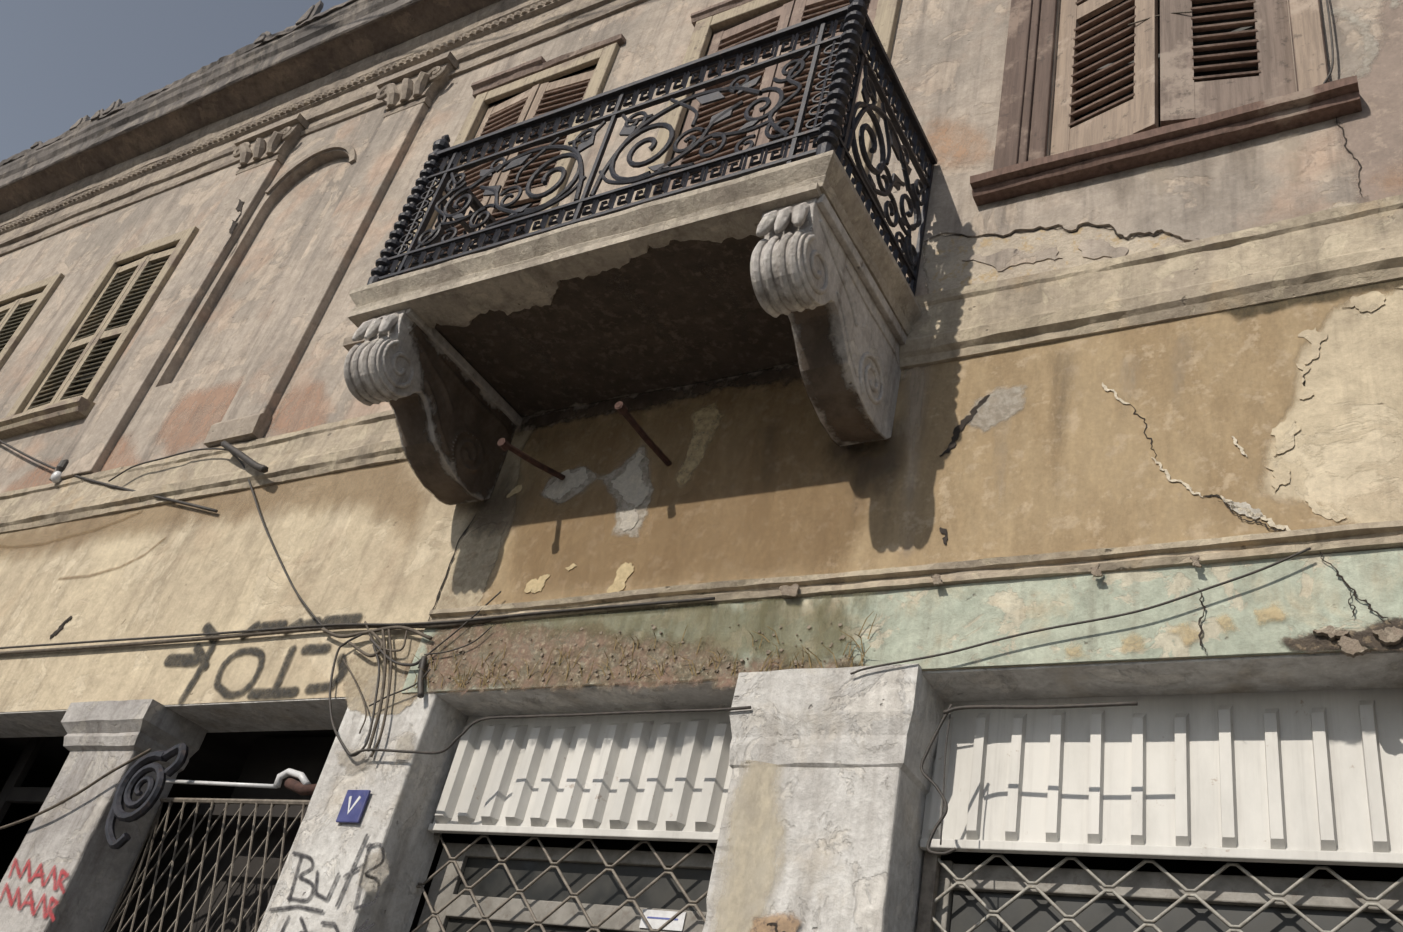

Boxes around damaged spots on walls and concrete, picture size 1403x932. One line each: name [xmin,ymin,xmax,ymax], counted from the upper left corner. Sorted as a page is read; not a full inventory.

crack [1336,117,1363,197]
spalling [348,182,822,416]
peeling [1343,286,1403,313]
peeling [1296,327,1328,400]
peeling [541,447,654,537]
spalling [939,386,1024,457]
crack [1102,382,1290,531]
peeling [1265,417,1301,492]
peeling [1305,499,1347,522]
crack [1198,588,1208,656]
spalling [1282,617,1403,658]
crack [1320,552,1391,623]